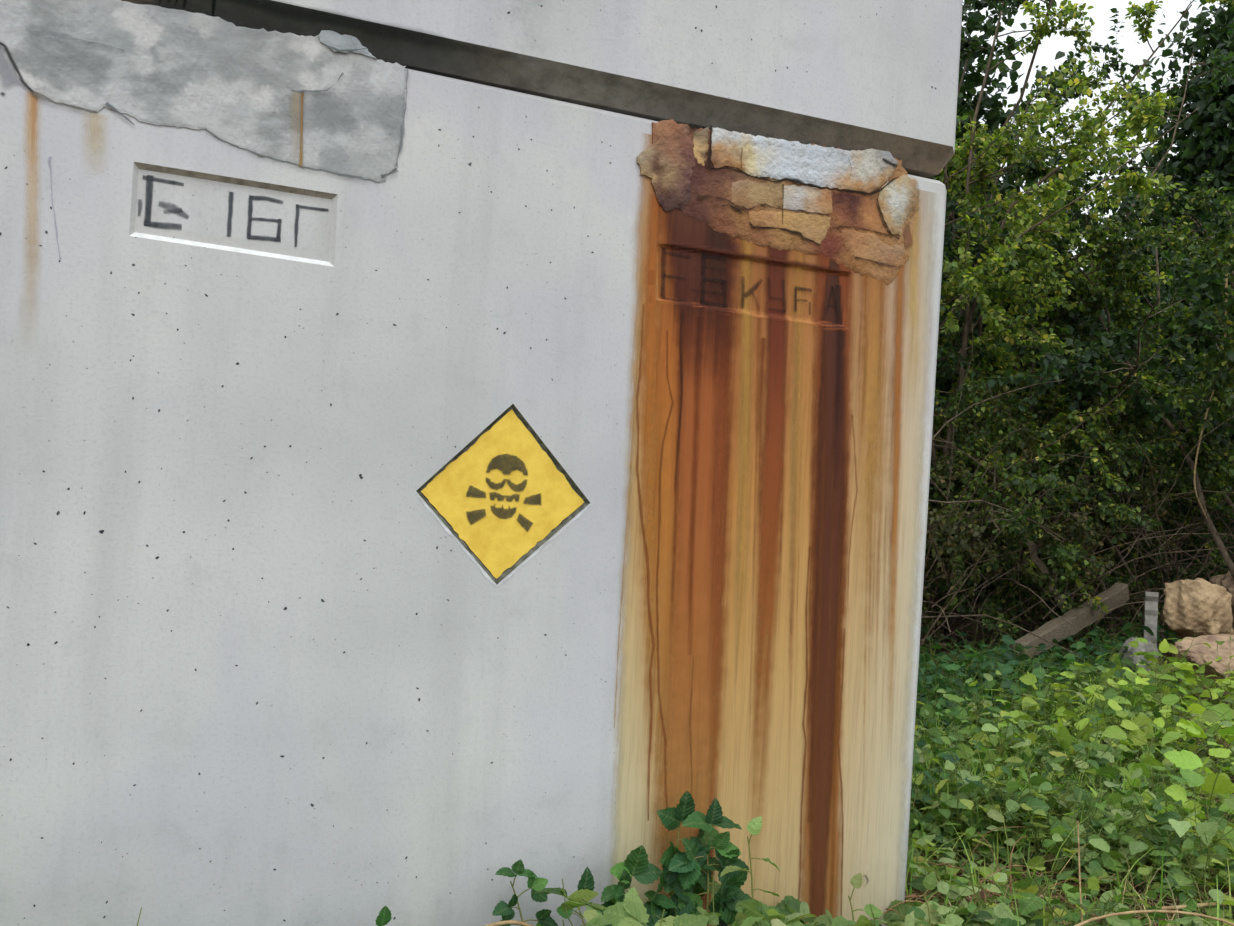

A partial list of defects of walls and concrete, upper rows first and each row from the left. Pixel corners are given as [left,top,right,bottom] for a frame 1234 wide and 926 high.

corrosion [28,91,37,258]
spalling [636,119,919,286]
corrosion [613,175,933,926]